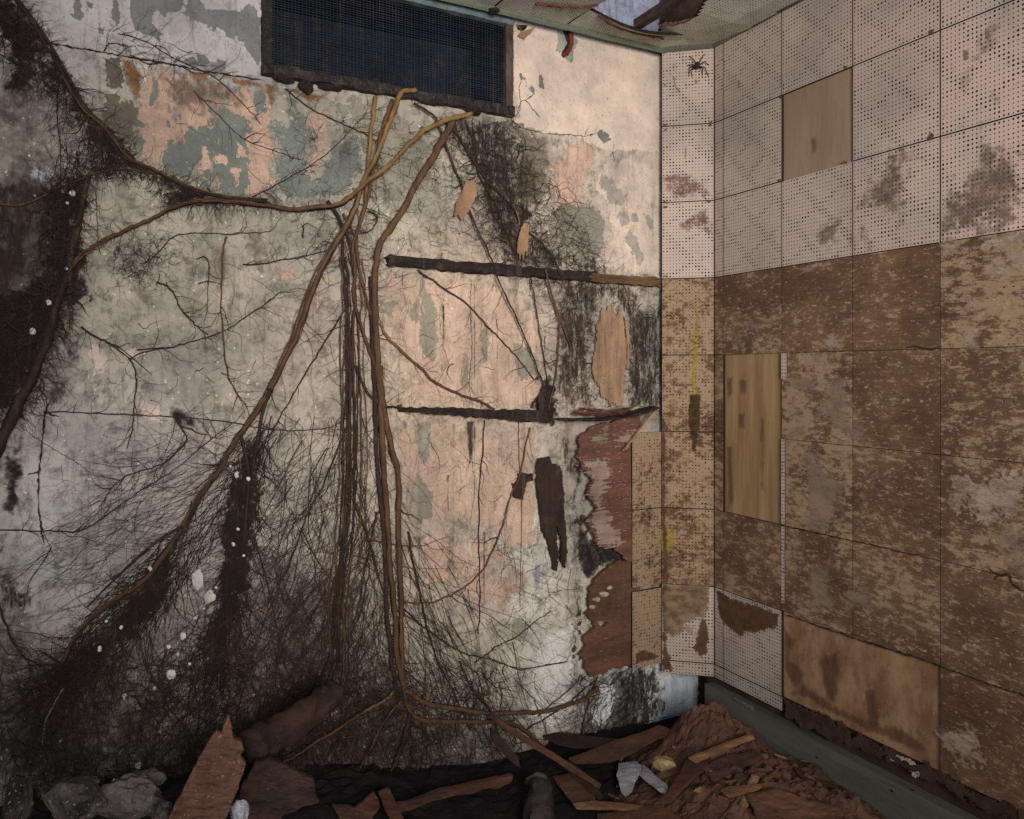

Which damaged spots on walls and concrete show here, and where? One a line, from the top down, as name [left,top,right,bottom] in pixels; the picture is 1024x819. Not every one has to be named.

peeling [35,0,431,205]
peeling [512,18,662,284]
mould [863,148,907,208]
mould [942,146,1021,233]
damp [437,117,779,728]
damp [207,424,268,648]